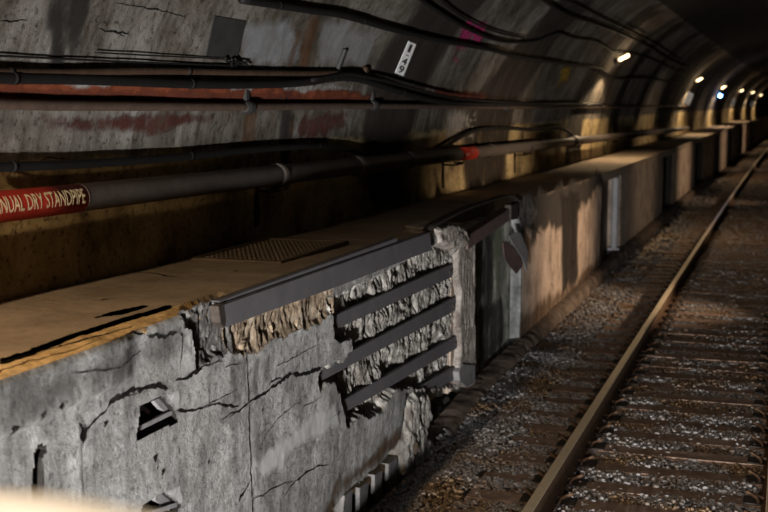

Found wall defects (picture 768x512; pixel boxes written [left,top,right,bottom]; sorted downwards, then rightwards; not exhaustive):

spalling [0,245,457,380]
crack [0,326,241,431]
spalling [136,396,178,440]
crack [177,345,321,420]
spalling [318,312,455,399]
spalling [344,353,460,429]
spalling [31,443,47,495]
crack [239,465,327,501]